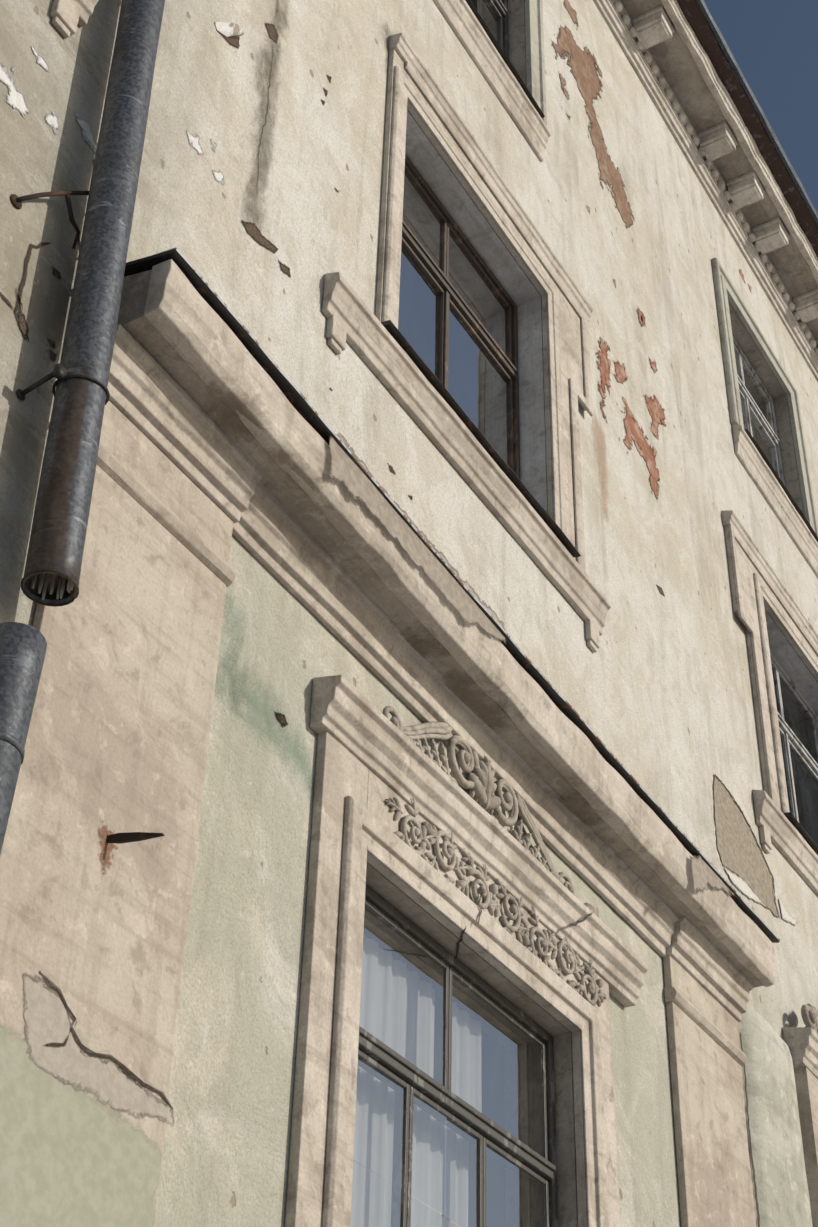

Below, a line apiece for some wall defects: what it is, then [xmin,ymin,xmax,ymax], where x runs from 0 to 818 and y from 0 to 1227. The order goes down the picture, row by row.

peeling [0,61,31,116]
peeling [31,45,50,77]
peeling [45,111,97,153]
peeling [551,0,635,229]
crack [0,236,81,361]
peeling [596,337,668,499]
spalling [690,774,799,926]
crack [23,971,174,1126]